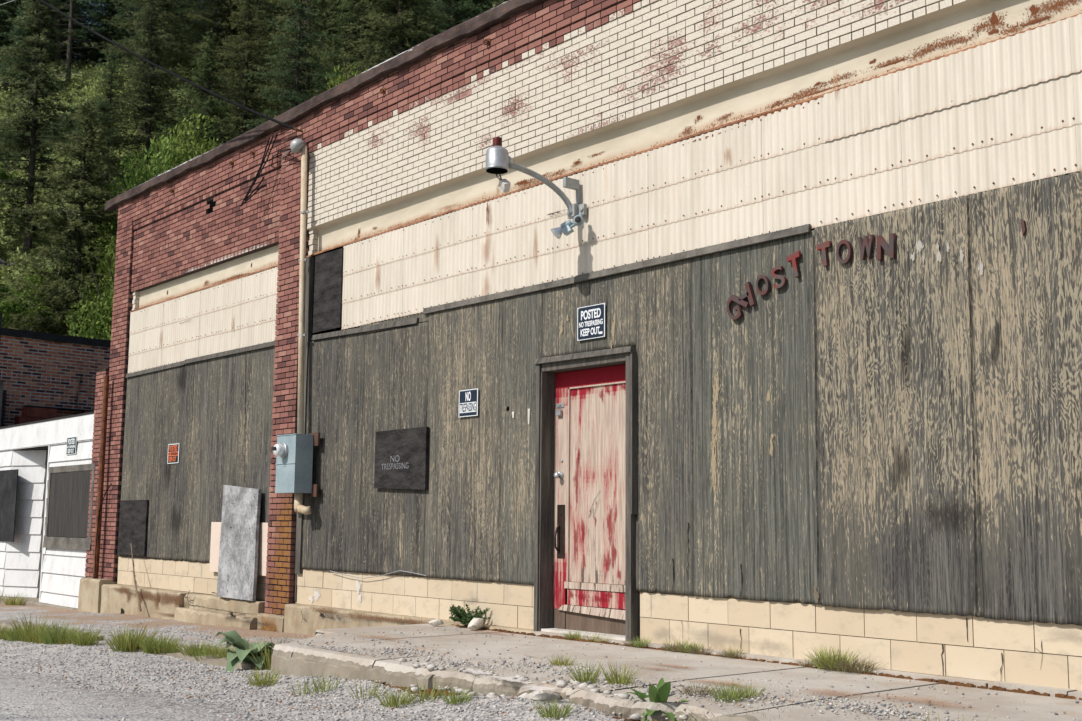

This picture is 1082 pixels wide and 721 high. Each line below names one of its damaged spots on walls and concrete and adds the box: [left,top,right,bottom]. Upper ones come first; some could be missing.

rust [679,0,1082,142]
peeling [574,496,621,579]
peeling [569,592,613,602]